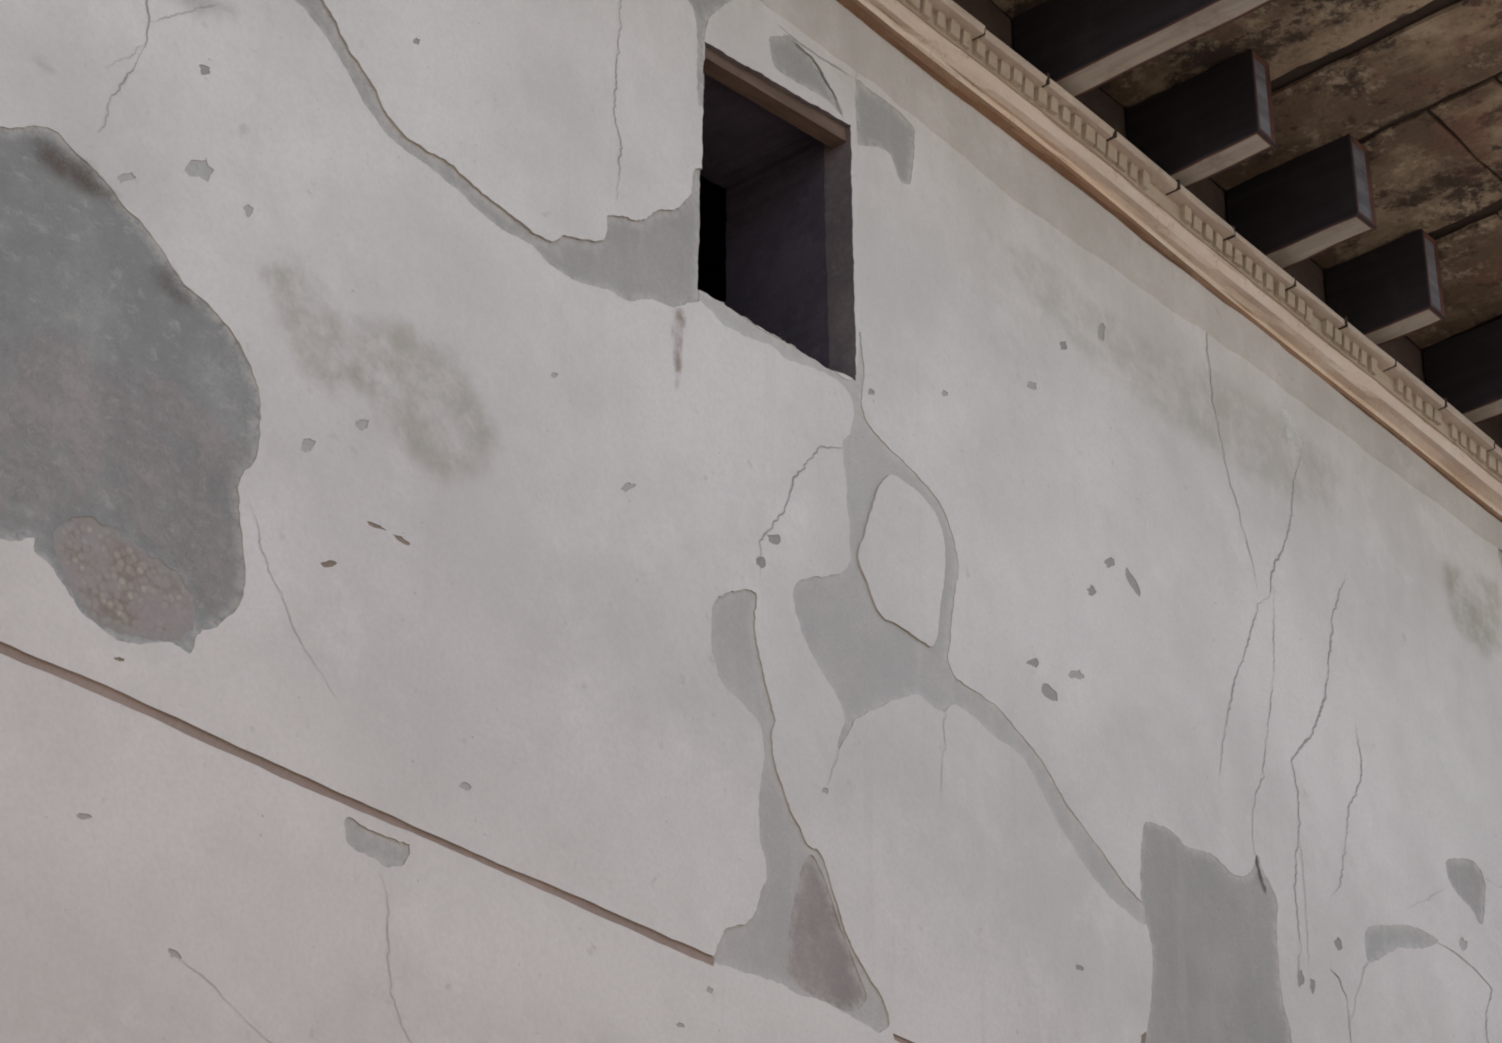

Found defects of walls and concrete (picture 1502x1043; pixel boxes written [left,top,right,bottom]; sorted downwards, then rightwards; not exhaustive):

crack [97,0,216,133]
crack [613,0,623,199]
spalling [0,125,261,653]
peeling [295,0,1315,1043]
crack [1206,333,1372,1042]
crack [380,873,412,1043]
crack [1434,941,1493,1043]